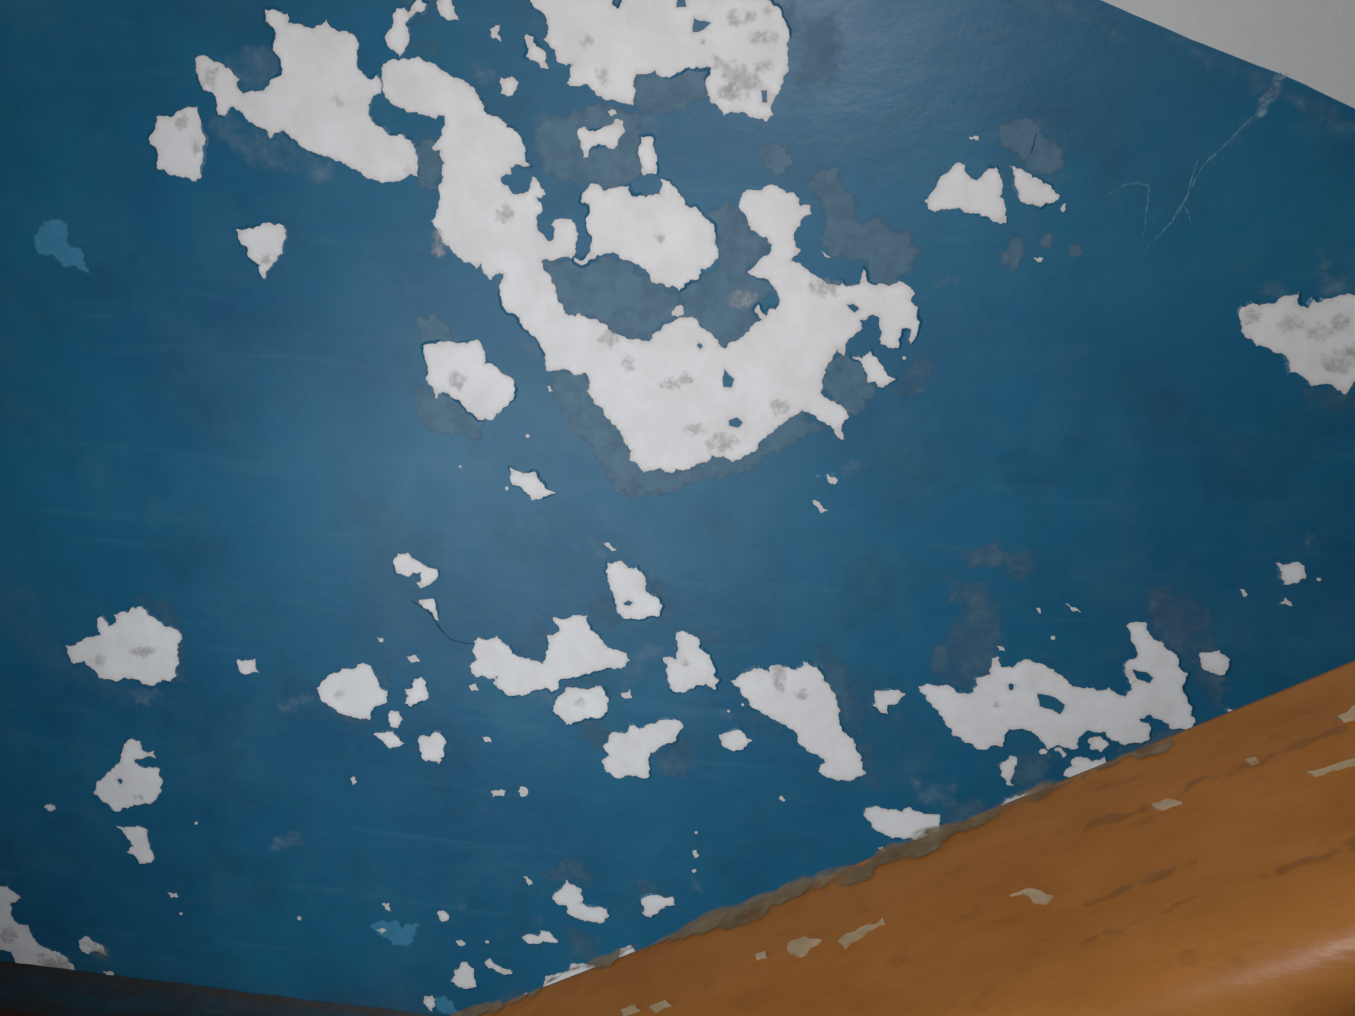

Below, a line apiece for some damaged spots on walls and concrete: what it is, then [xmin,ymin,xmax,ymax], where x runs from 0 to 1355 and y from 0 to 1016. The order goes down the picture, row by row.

peeling [146,0,923,500]
peeling [925,118,1066,270]
peeling [1237,285,1355,403]
peeling [1274,560,1322,606]
peeling [65,604,182,686]
peeling [316,655,447,764]
peeling [469,542,866,781]
peeling [871,592,1232,805]
peeling [92,737,164,865]
peeling [862,801,983,849]
peeling [0,884,114,975]
peeling [449,940,515,990]